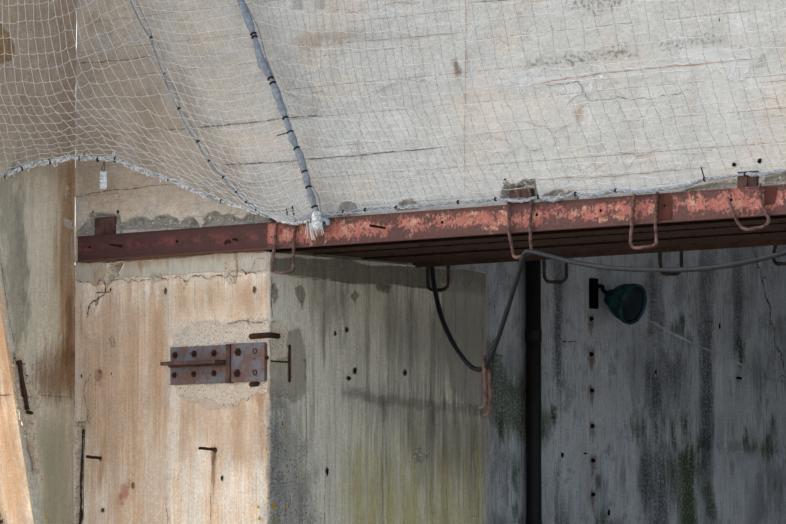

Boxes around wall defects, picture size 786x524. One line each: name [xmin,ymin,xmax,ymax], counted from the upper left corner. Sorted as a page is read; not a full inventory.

crack [304,0,504,64]
crack [160,86,324,149]
crack [226,112,439,177]
crack [460,51,754,196]
crack [75,176,174,206]
corrosion [658,195,672,220]
corrosion [764,187,777,206]
spalling [104,261,124,290]
crack [0,258,383,423]
spalling [174,318,288,360]
spalling [12,348,42,475]
spalling [177,383,268,406]